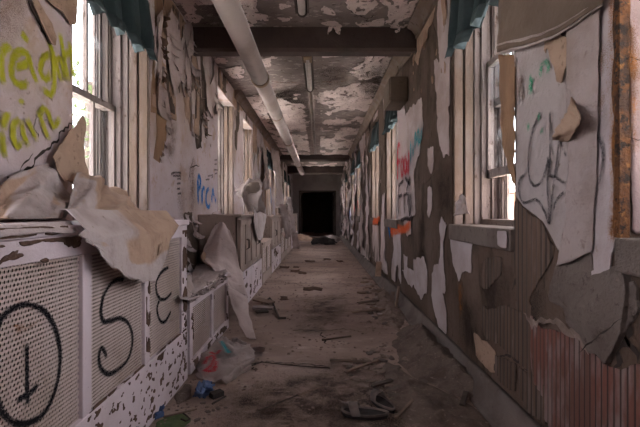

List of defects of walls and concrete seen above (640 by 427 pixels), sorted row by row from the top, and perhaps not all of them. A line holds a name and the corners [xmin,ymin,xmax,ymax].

peeling [28,0,57,45]
peeling [48,0,78,25]
peeling [151,0,473,334]
spalling [497,0,640,427]
spalling [0,236,82,265]
peeling [109,212,205,427]
crack [580,318,640,368]